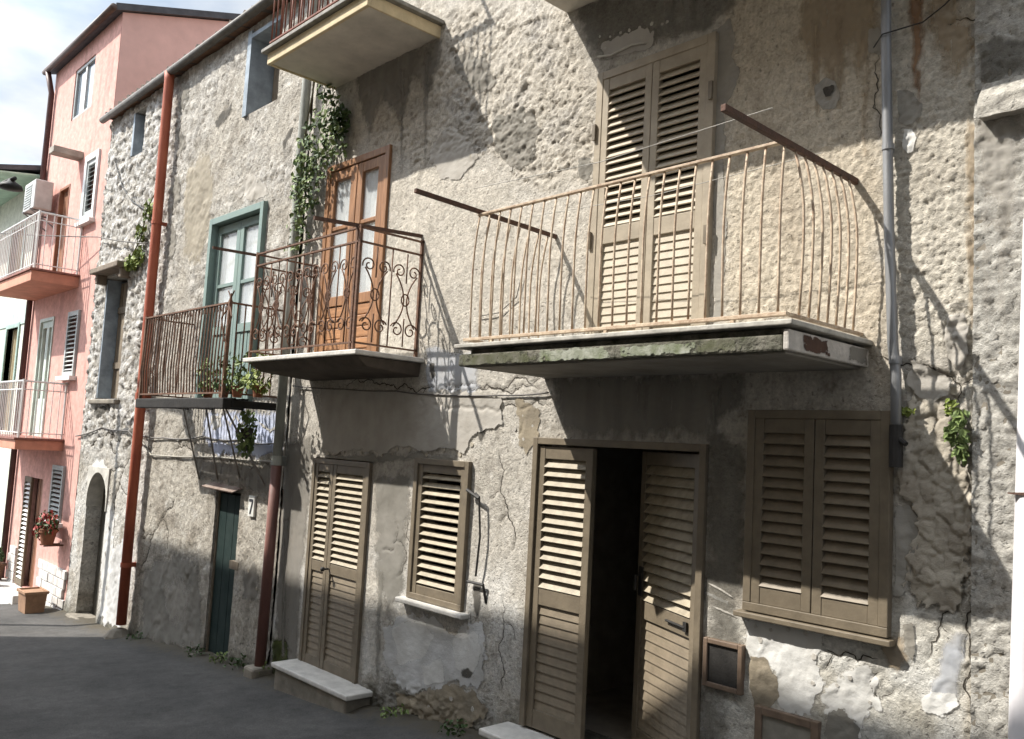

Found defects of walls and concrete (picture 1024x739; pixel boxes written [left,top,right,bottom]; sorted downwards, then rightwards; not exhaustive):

flaking render [597,20,669,59]
corrosion [909,0,923,92]
corrosion [804,335,830,356]
flaking render [319,363,540,457]
crack [344,376,546,411]
crack [491,457,516,545]
peeling [382,612,488,729]
crack [498,597,515,685]
peeling [741,619,882,739]
peeling [921,691,959,717]
crack [929,595,971,706]